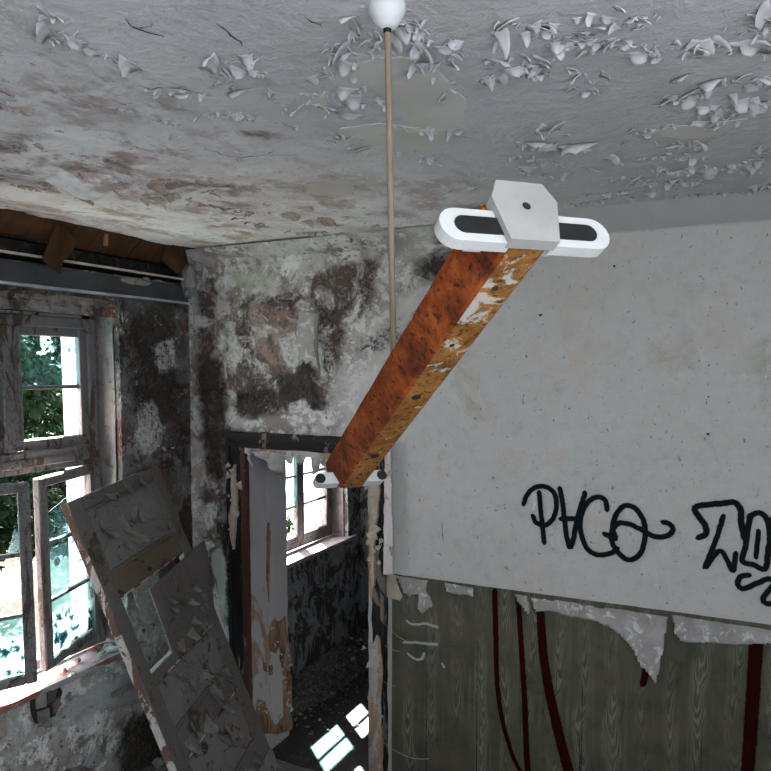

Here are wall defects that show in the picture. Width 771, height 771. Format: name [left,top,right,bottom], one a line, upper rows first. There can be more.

flaking render [139,178,174,209]
peeling [106,88,255,128]
flaking render [186,177,272,229]
flaking render [268,206,353,243]
peeling [198,16,469,144]
peeling [503,121,624,181]
peeling [478,0,771,98]
damp [133,302,177,454]
damp [196,259,377,629]
damp [120,713,162,771]
peeling [254,616,293,735]
peeling [361,634,384,771]